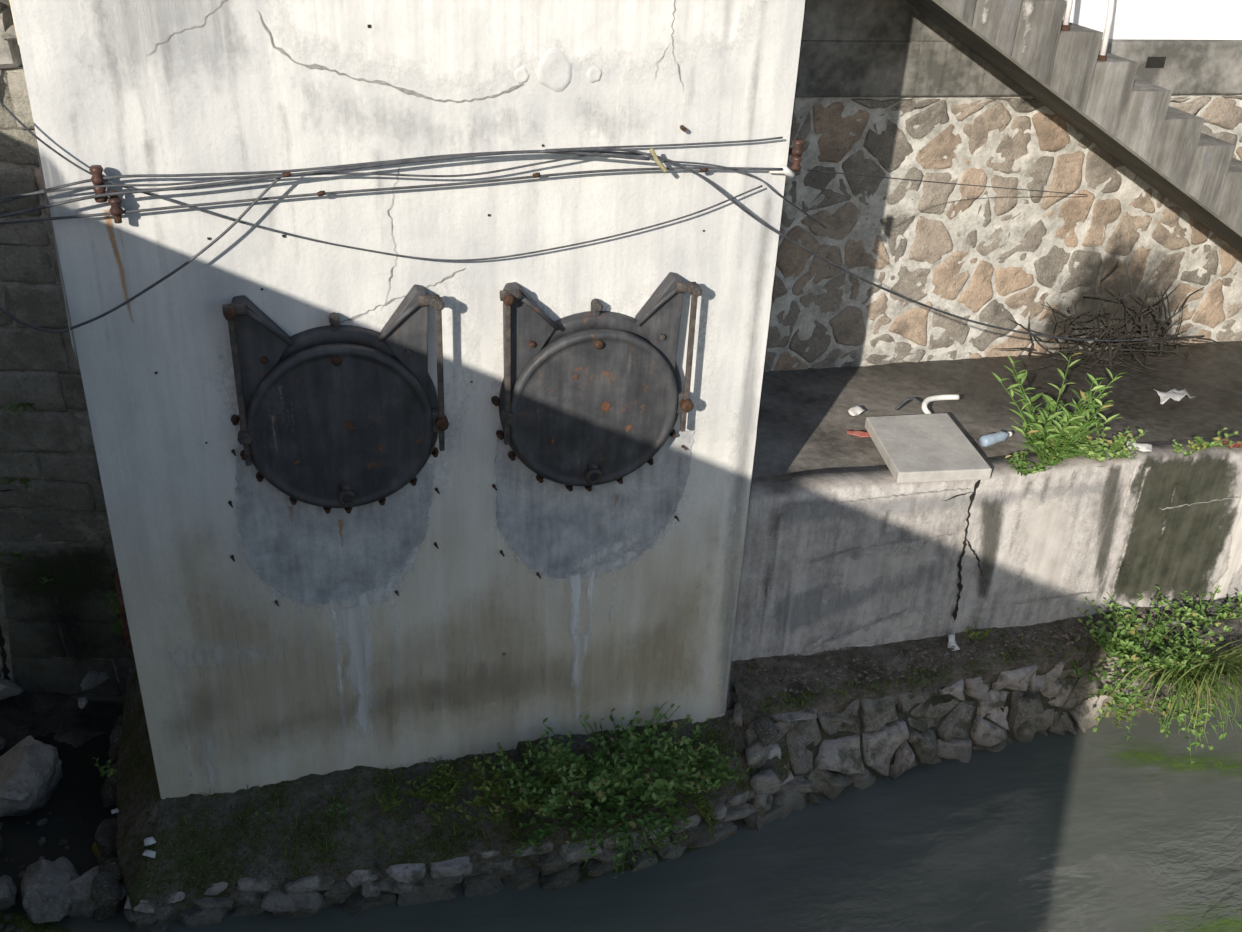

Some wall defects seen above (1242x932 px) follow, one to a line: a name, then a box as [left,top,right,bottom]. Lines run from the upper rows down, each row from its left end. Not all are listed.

corrosion [105,211,130,310]
crack [0,625,10,681]
leakage [330,594,371,734]
leakage [570,571,596,701]
crack [779,480,984,620]
crack [1015,592,1092,605]